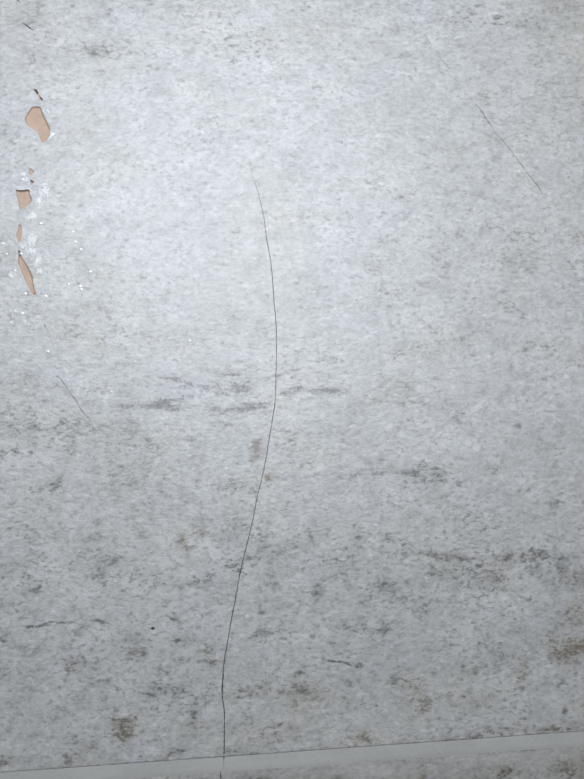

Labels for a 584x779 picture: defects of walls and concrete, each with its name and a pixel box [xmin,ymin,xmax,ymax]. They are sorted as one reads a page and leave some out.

spalling [23,89,55,144]
spalling [8,169,50,295]
crack [220,232,277,779]